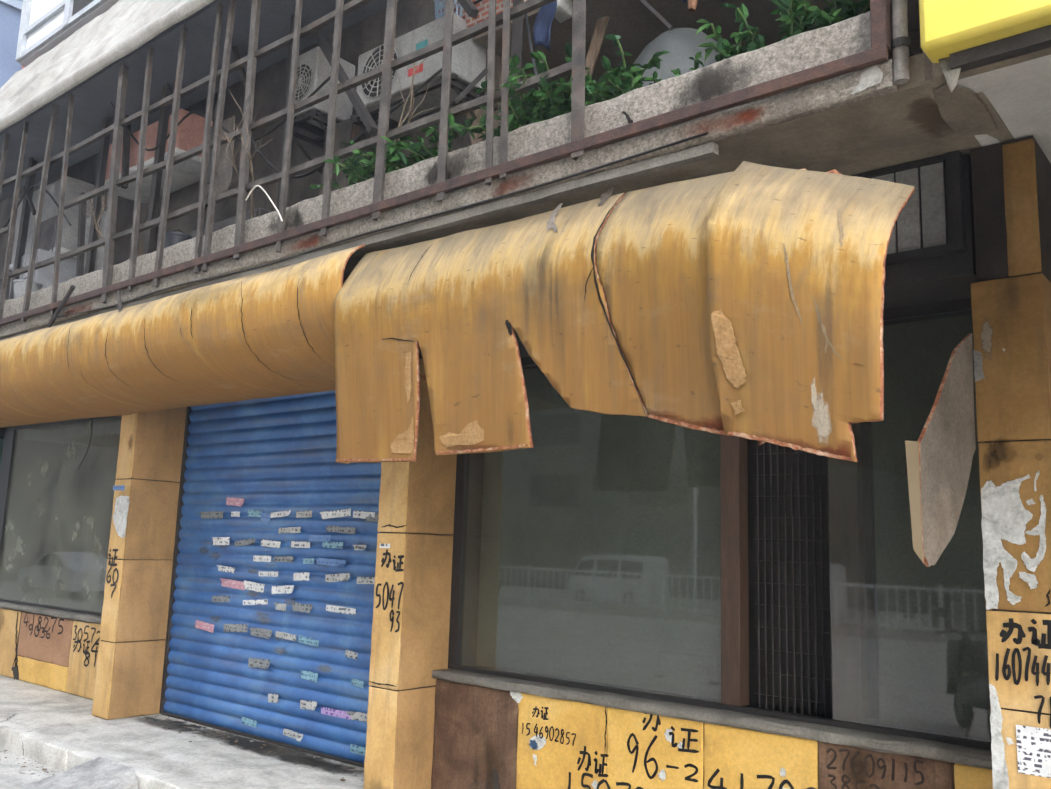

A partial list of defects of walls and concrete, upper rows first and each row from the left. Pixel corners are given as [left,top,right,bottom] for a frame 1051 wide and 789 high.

crack [67,327,133,389]
crack [241,284,308,382]
crack [297,279,320,357]
crack [584,193,645,413]
peeling [711,309,747,415]
peeling [439,420,484,448]
peeling [113,495,130,538]
peeling [981,471,1046,610]
crack [11,612,19,667]